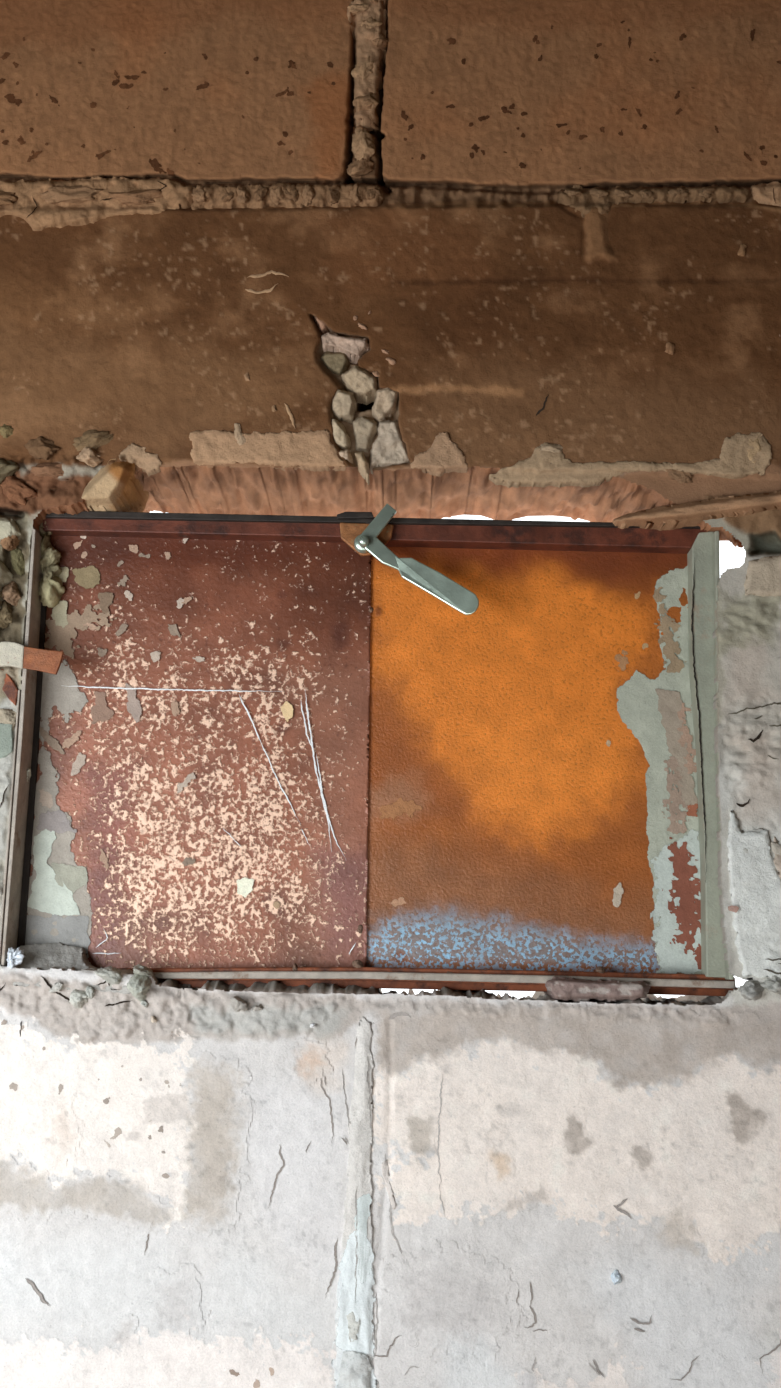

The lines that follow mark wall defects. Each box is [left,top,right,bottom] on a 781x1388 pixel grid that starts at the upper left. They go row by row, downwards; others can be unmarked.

spalling [314,311,410,485]
peeling [612,565,701,974]
rust [653,587,701,970]
crack [736,799,771,851]
crack [729,702,781,759]
leakage [0,1050,255,1238]
crack [759,1340,781,1373]